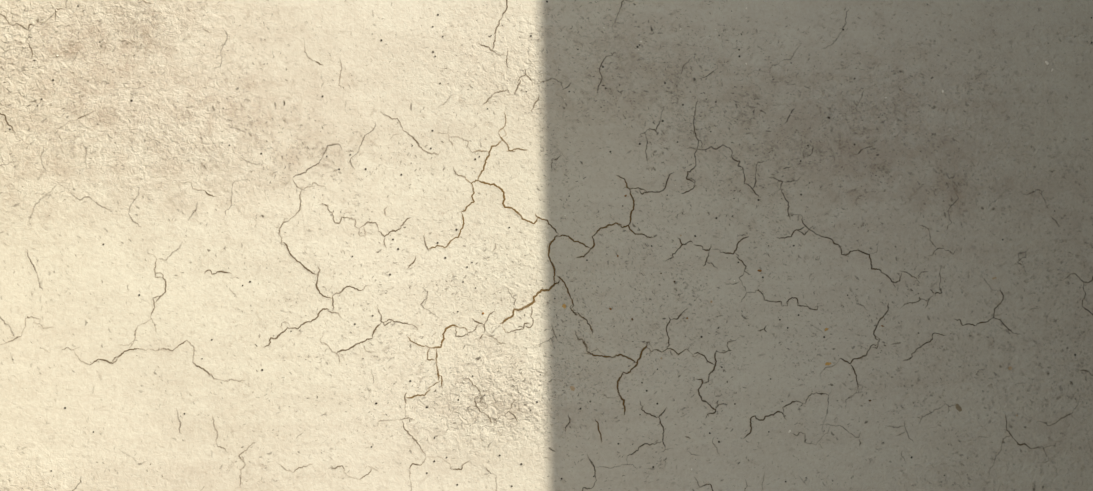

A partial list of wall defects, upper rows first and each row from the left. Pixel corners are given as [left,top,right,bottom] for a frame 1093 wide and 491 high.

crack [263,0,941,491]
crack [90,263,215,379]
crack [904,287,1011,361]
crack [1076,274,1093,317]
crack [1004,413,1032,450]